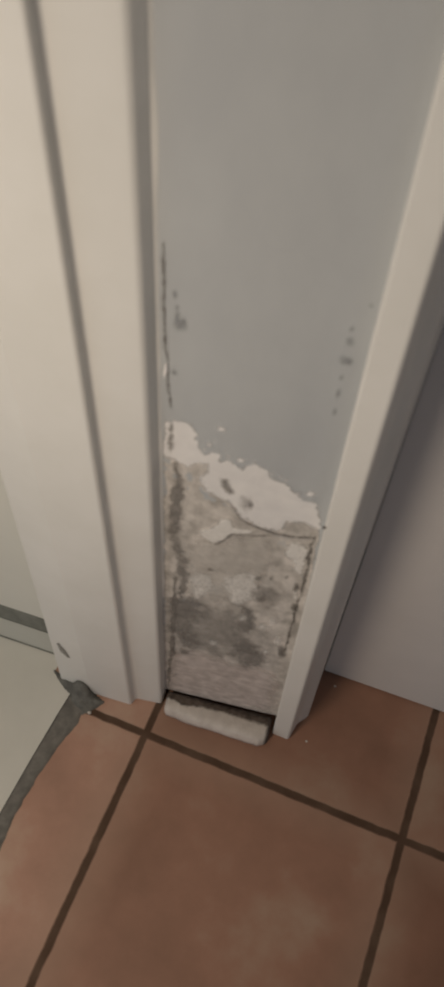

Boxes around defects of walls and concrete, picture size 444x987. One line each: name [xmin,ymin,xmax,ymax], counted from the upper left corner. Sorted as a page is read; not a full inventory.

water stain [167,462,202,684]
flaking render [163,420,321,716]
water stain [235,607,263,664]